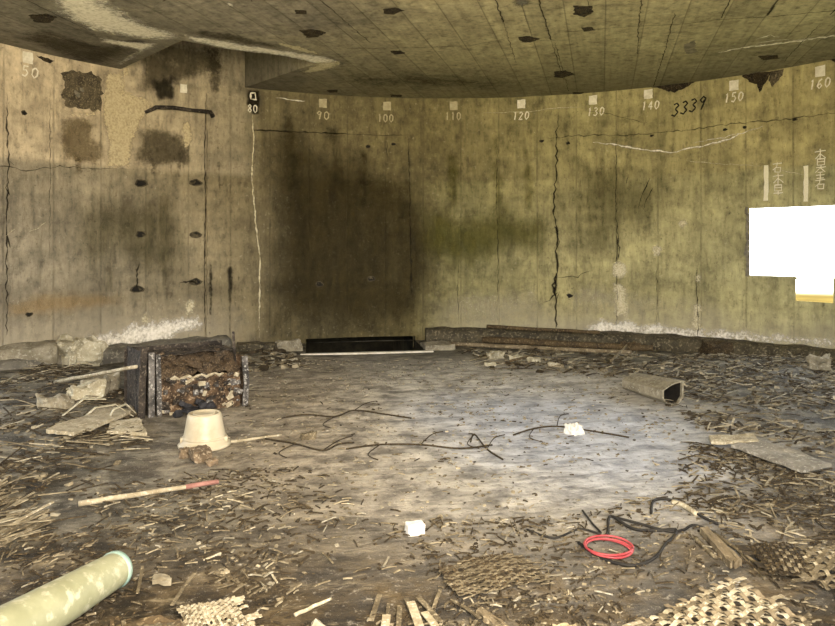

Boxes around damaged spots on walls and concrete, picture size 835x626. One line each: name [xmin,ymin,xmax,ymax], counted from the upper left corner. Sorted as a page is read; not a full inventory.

leakage [63,119,99,171]
peeling [61,67,150,167]
leakage [138,130,188,165]
crack [539,0,835,91]
spalling [742,69,784,92]
leakage [280,140,428,317]
crack [546,111,834,330]
leakage [98,302,200,345]
leakage [588,262,831,344]